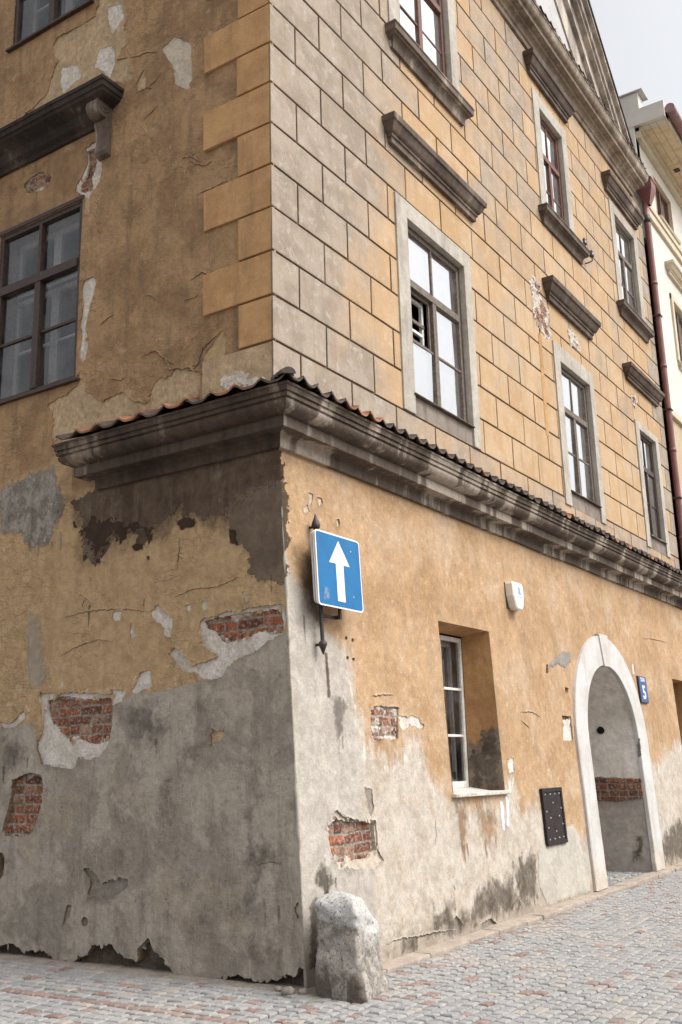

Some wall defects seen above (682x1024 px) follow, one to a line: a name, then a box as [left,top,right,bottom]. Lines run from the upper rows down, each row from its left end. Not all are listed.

flaking render [162,37,195,90]
flaking render [81,150,97,215]
flaking render [529,275,552,340]
crack [141,331,221,371]
flaking render [38,691,115,745]
flaking render [370,704,400,744]
flaking render [1,773,43,838]
flaking render [325,787,382,872]
leakage [469,727,502,790]
flaking render [594,777,643,802]
flaking render [85,867,128,901]
leakage [402,856,537,953]